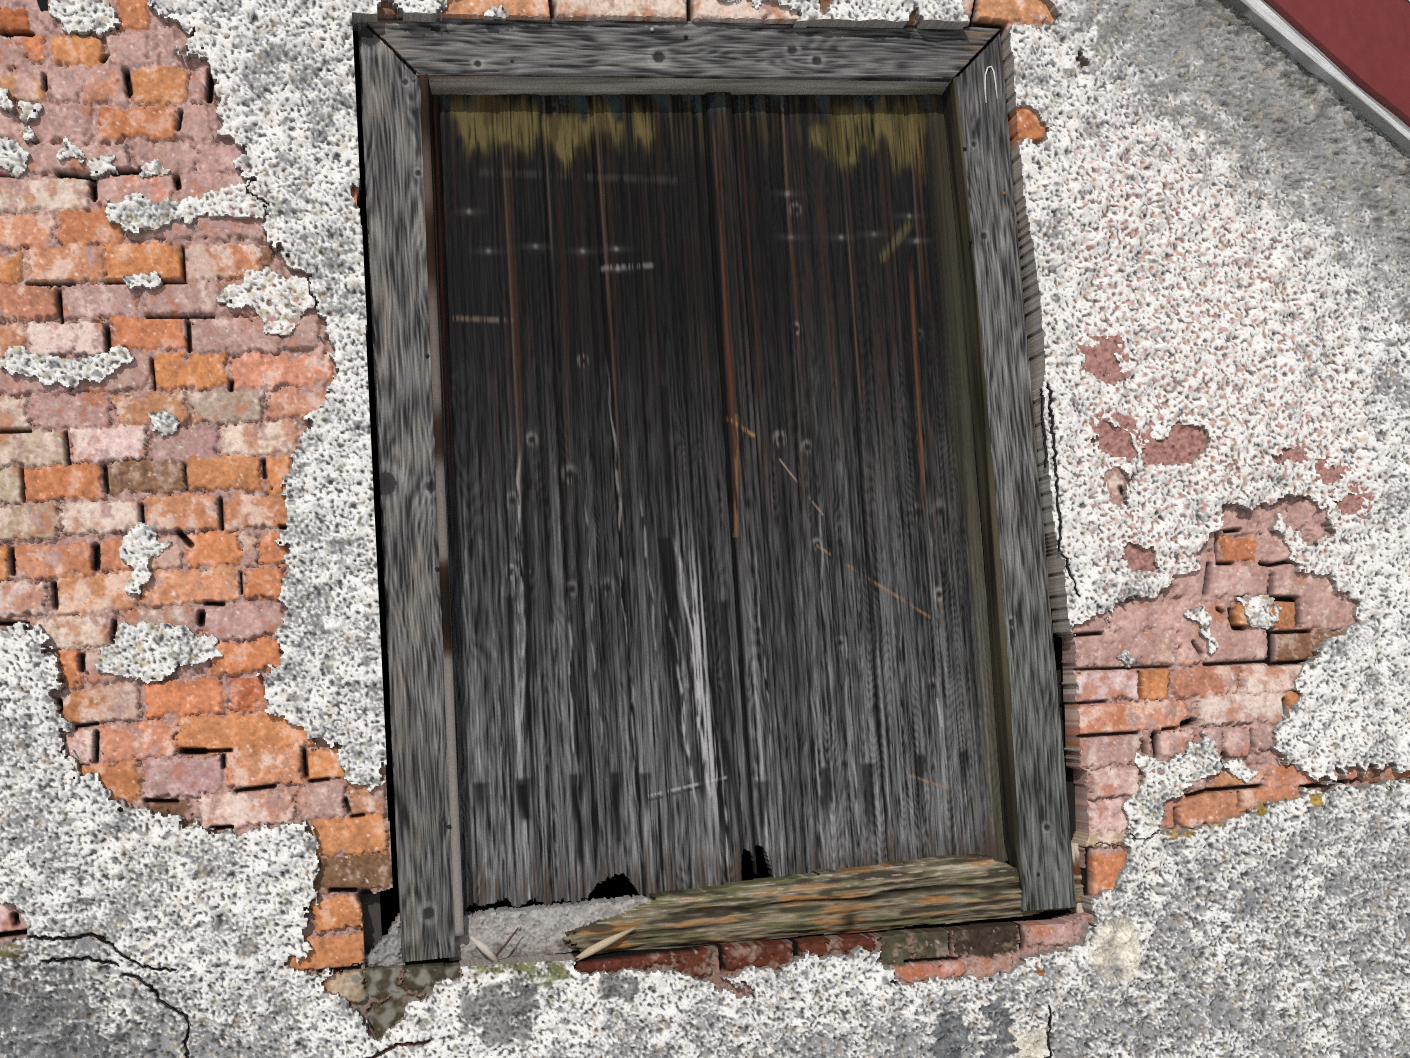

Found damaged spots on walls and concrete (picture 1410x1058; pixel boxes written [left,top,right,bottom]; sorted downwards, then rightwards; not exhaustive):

flaking render [436,0,800,24]
flaking render [818,0,832,15]
flaking render [905,11,920,26]
flaking render [962,0,1058,37]
flaking render [0,0,463,1039]
flaking render [572,438,1410,997]
crack [29,933,189,1058]